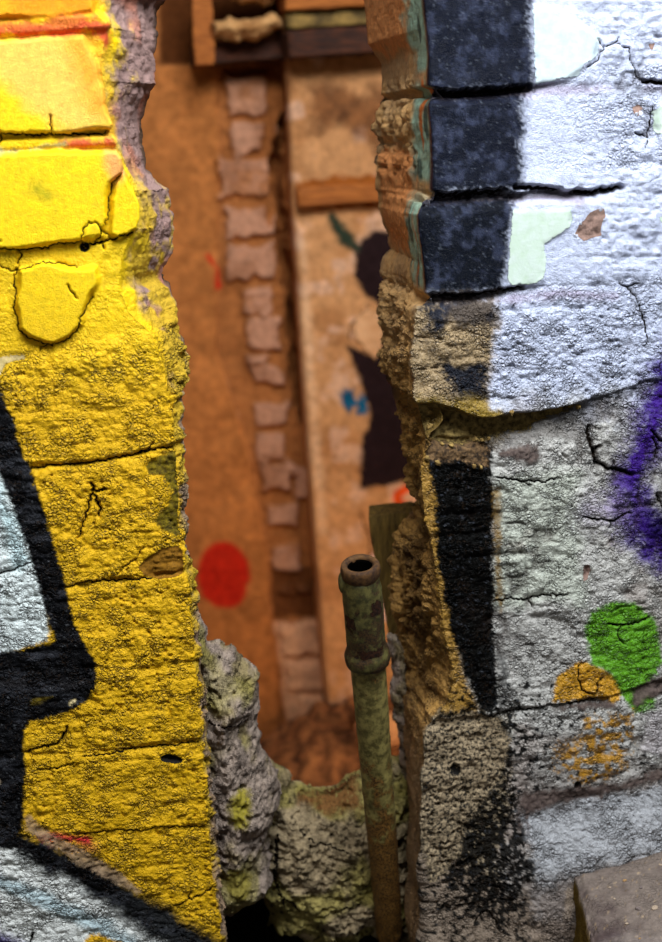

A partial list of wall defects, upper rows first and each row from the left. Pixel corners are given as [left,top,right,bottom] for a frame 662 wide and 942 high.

peeling [532,5,601,85]
crack [587,37,662,148]
peeling [633,105,662,133]
peeling [508,206,606,286]
crack [585,426,630,474]
crack [498,477,556,485]
crack [493,592,566,606]